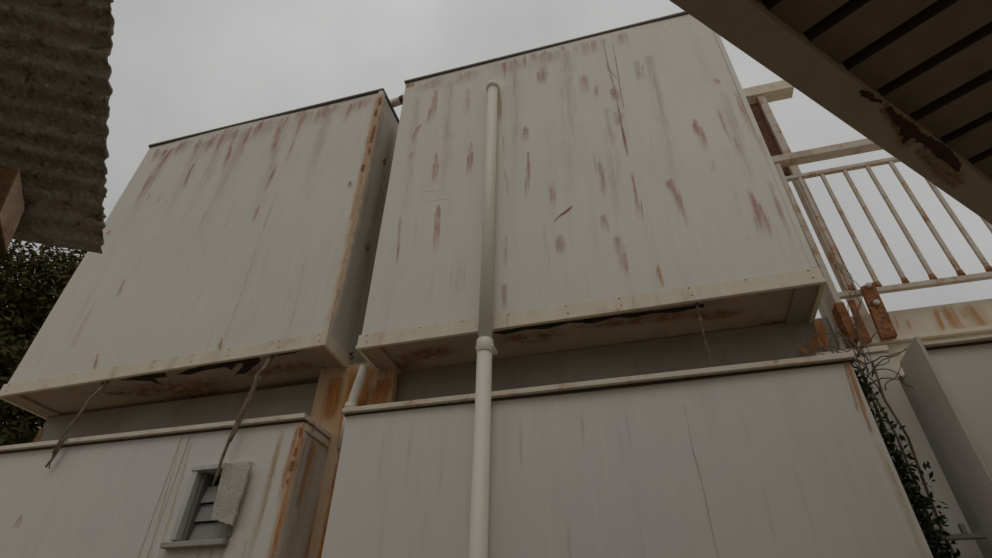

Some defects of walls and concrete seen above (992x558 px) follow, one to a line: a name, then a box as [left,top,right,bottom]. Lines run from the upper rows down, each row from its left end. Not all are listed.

peeling [859,90,962,172]
spalling [493,304,704,335]
spalling [122,357,260,386]
rust [324,367,389,436]
rust [270,425,314,558]
rust [307,464,338,558]